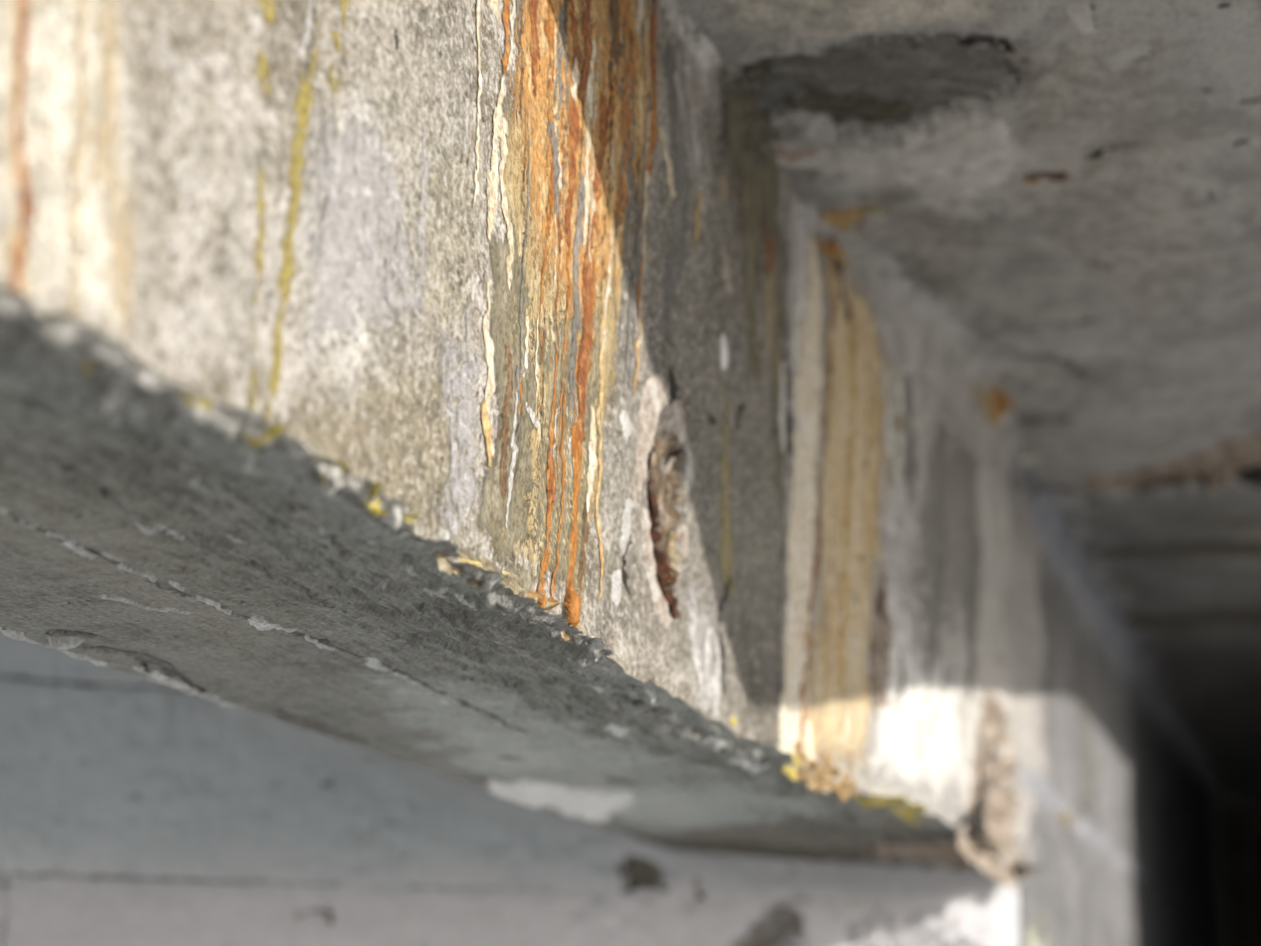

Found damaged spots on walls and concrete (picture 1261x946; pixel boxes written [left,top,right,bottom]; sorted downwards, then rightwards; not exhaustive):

corrosion [0,0,38,308]
corrosion [478,0,676,645]
spalling [619,368,694,629]
damp [662,19,706,344]
corrosion [783,236,890,801]
damp [720,32,1032,825]
spalling [1081,431,1261,496]